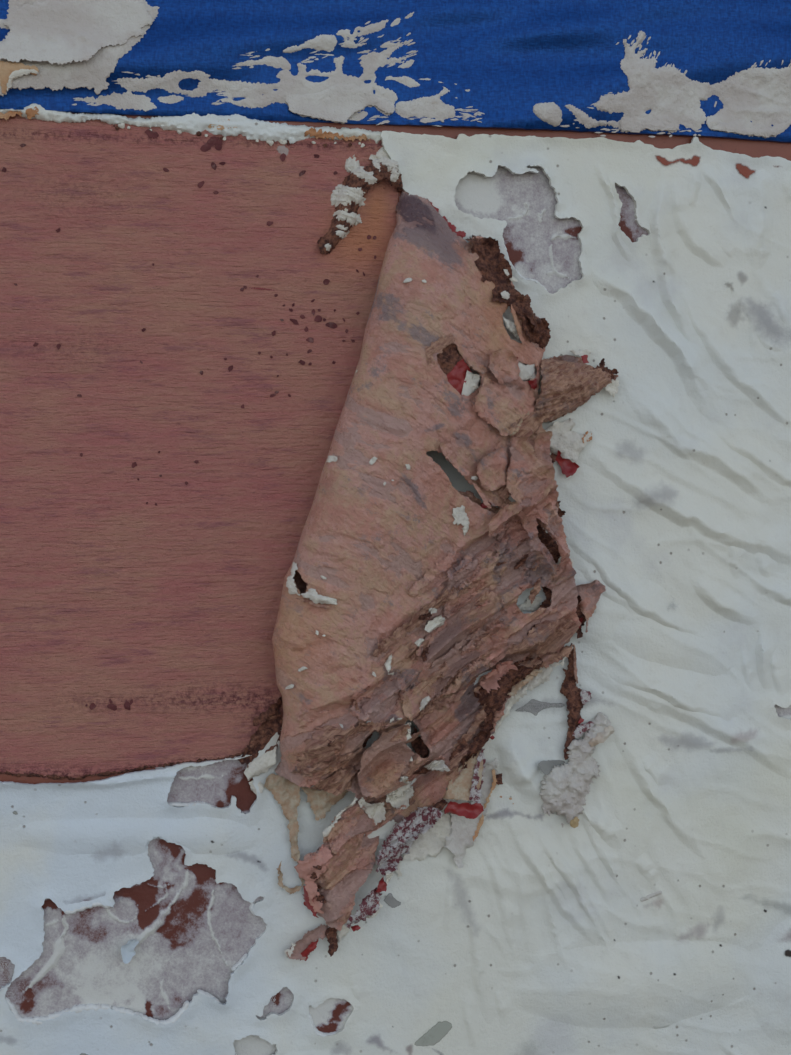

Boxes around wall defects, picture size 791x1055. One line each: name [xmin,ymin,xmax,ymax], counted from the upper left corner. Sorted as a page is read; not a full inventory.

spalling [533,102,562,127]
peeling [155,166,619,961]
peeling [774,705,791,719]
peeling [0,838,266,1025]
peeling [256,987,293,1019]
peeling [309,998,353,1036]